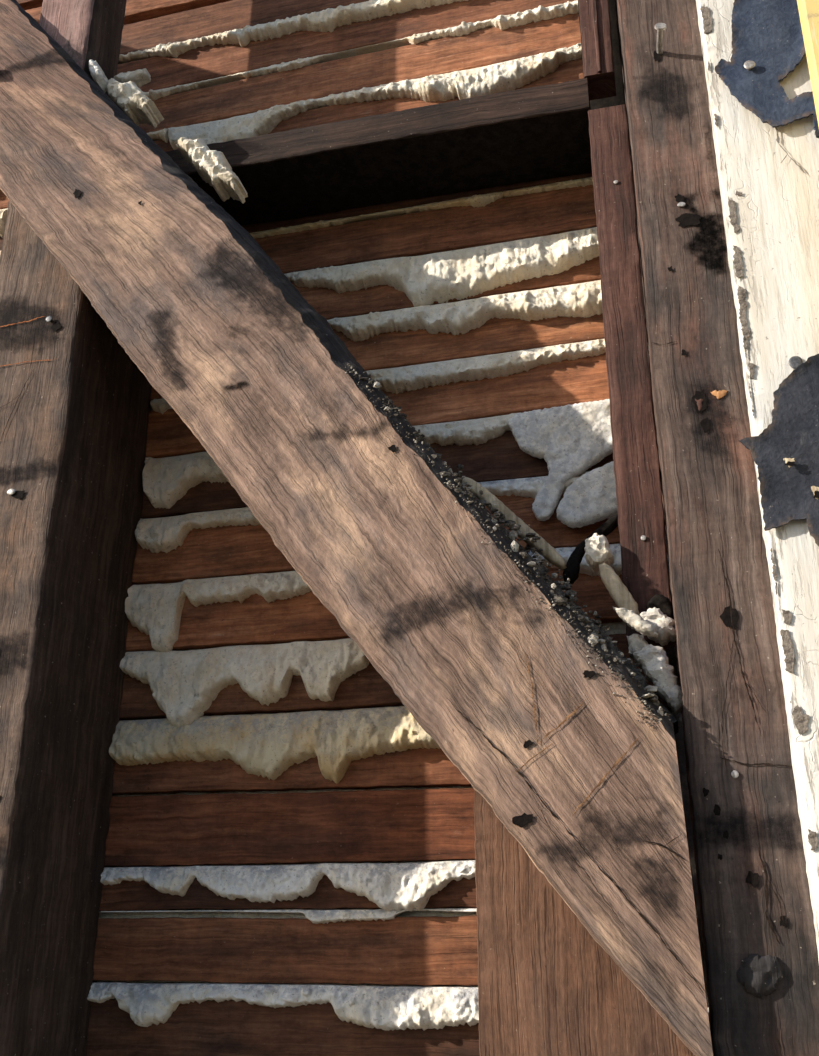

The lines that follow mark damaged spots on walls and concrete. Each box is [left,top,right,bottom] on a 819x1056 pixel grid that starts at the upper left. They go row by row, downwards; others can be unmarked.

peeling [770,548,778,595]
peeling [780,609,795,674]
peeling [792,705,809,734]
crack [447,698,703,992]
peeling [808,829,819,851]